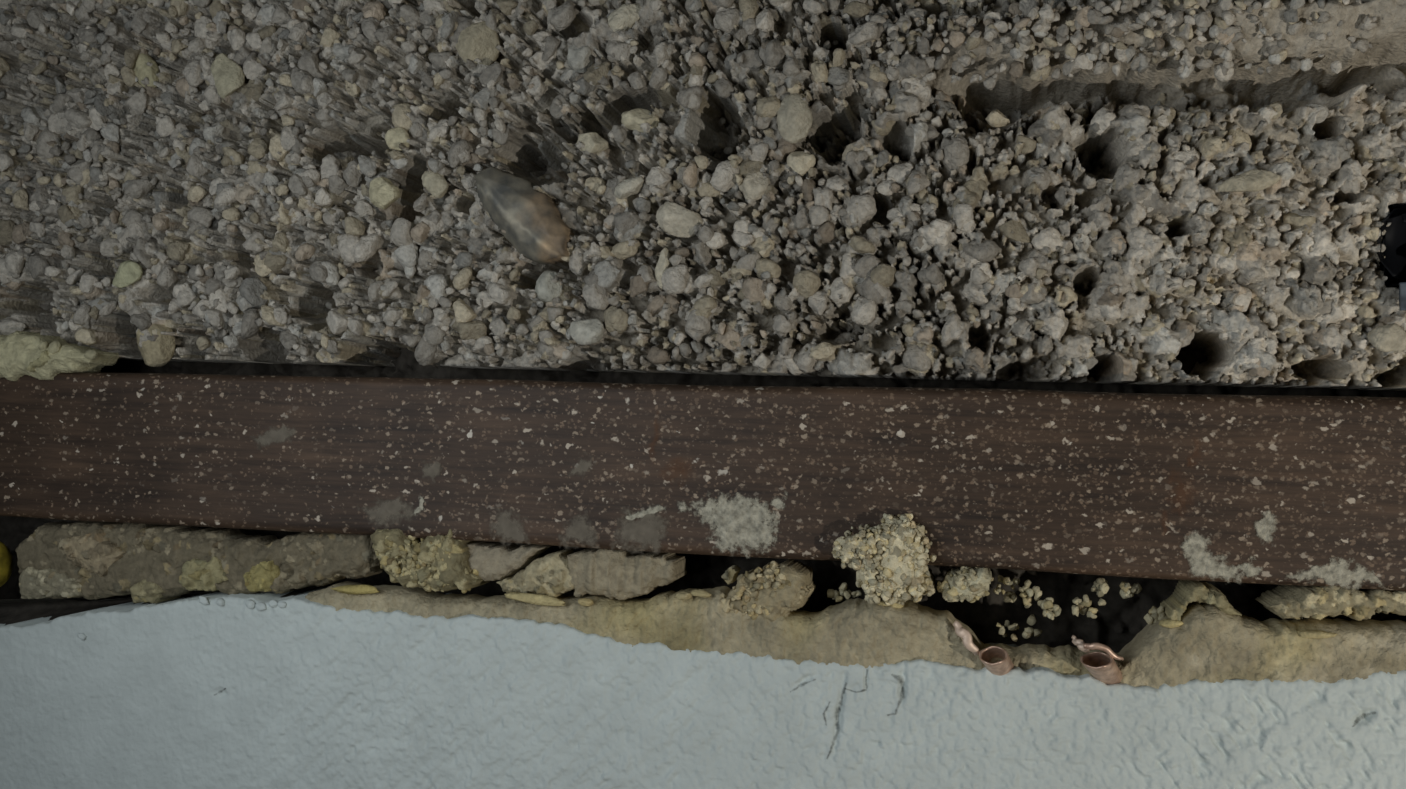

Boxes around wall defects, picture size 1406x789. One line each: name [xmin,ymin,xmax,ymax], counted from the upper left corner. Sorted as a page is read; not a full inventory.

leakage [617,493,787,558]
peeling [305,581,1406,689]